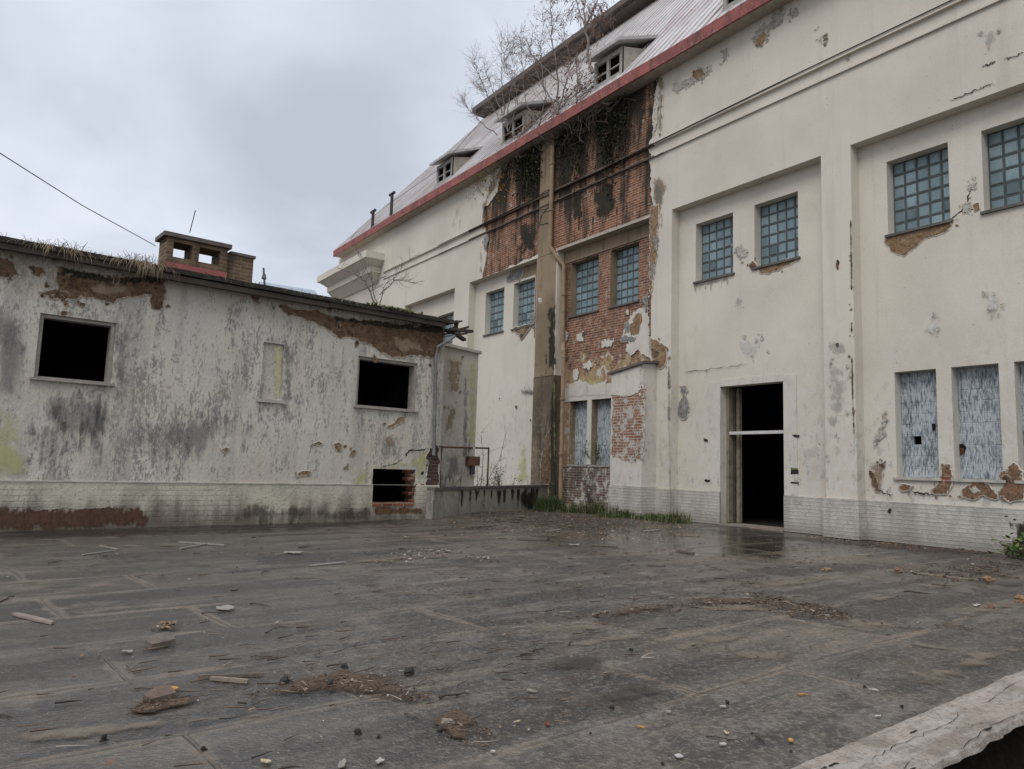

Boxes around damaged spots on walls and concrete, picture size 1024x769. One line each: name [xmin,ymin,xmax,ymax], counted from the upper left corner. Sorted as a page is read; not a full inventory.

peeling [751,6,798,47]
crack [953,52,1024,100]
water stain [558,85,647,234]
spalling [0,254,171,316]
flaking render [483,147,541,283]
water stain [516,155,536,269]
flaking render [553,48,729,463]
spalling [884,176,980,258]
spalling [251,295,464,430]
flaking render [930,462,1024,503]
crack [861,680,1024,769]